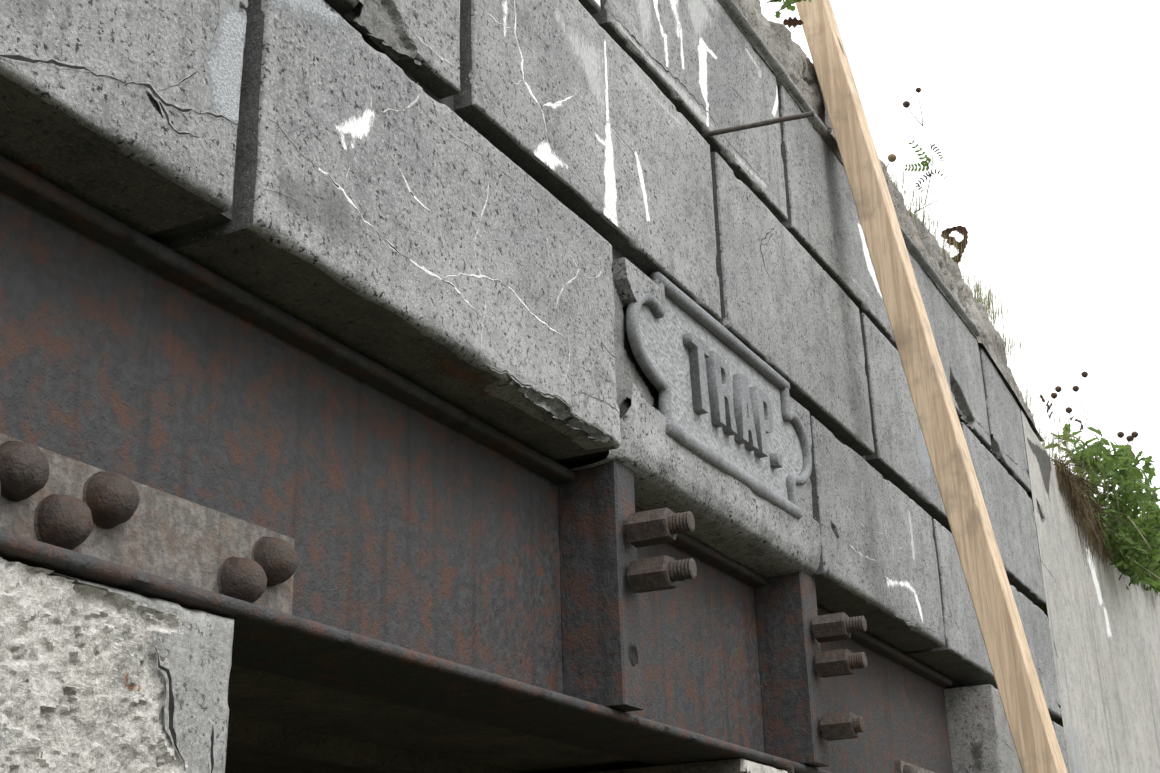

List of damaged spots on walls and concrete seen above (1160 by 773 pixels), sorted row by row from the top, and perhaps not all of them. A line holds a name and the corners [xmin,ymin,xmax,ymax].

crack [0,51,241,138]
spalling [272,0,424,65]
crack [475,0,652,257]
damp [634,151,650,222]
damp [619,0,717,127]
crack [271,71,618,442]
spalling [0,557,193,773]